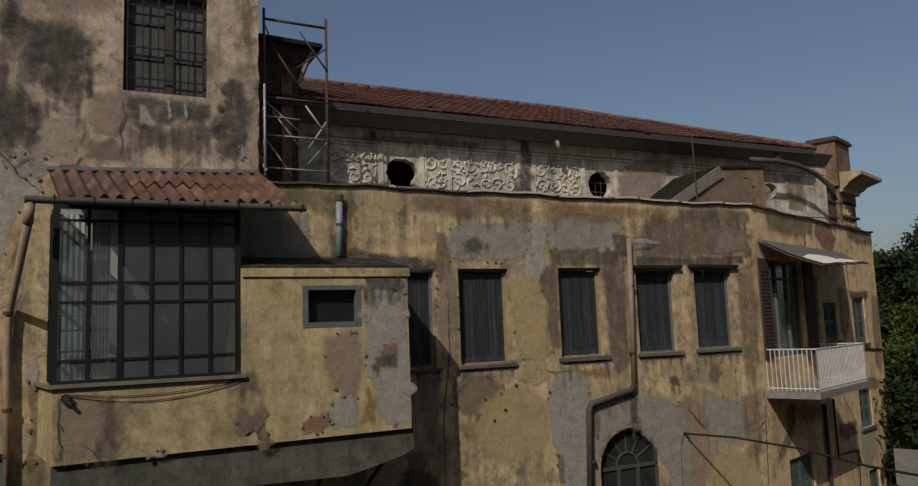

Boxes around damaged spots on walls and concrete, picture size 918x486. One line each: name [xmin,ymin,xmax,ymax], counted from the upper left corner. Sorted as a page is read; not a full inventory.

crack [0,152,38,190]
leakage [0,0,100,152]
leakage [128,79,250,170]
leakage [514,141,534,191]
flaking render [358,276,417,428]
crack [436,292,459,486]
flaking render [547,370,710,486]